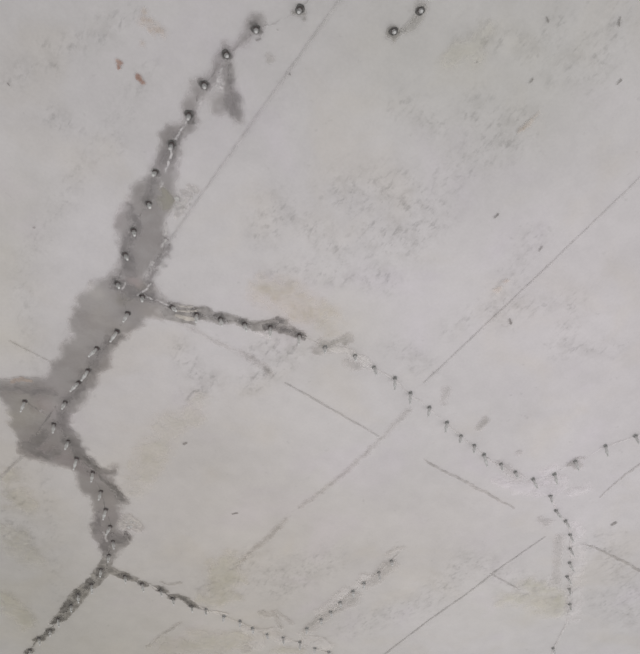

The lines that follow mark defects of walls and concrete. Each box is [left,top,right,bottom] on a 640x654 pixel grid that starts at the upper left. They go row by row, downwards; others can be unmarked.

damp [0,13,333,642]